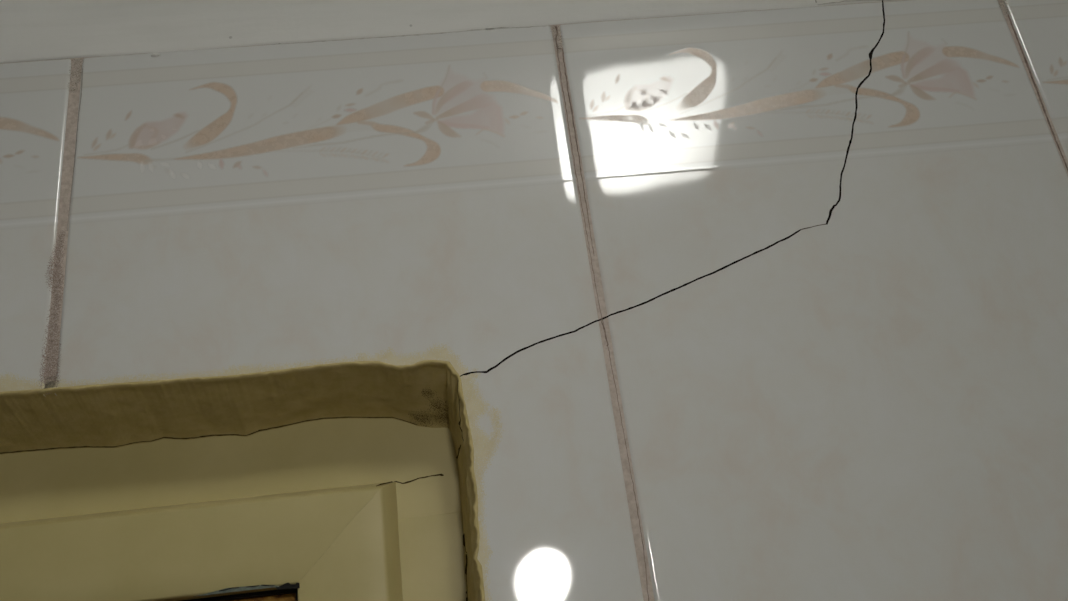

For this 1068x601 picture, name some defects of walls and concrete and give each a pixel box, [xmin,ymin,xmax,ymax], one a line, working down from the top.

crack [0,417,417,454]
crack [377,0,885,601]